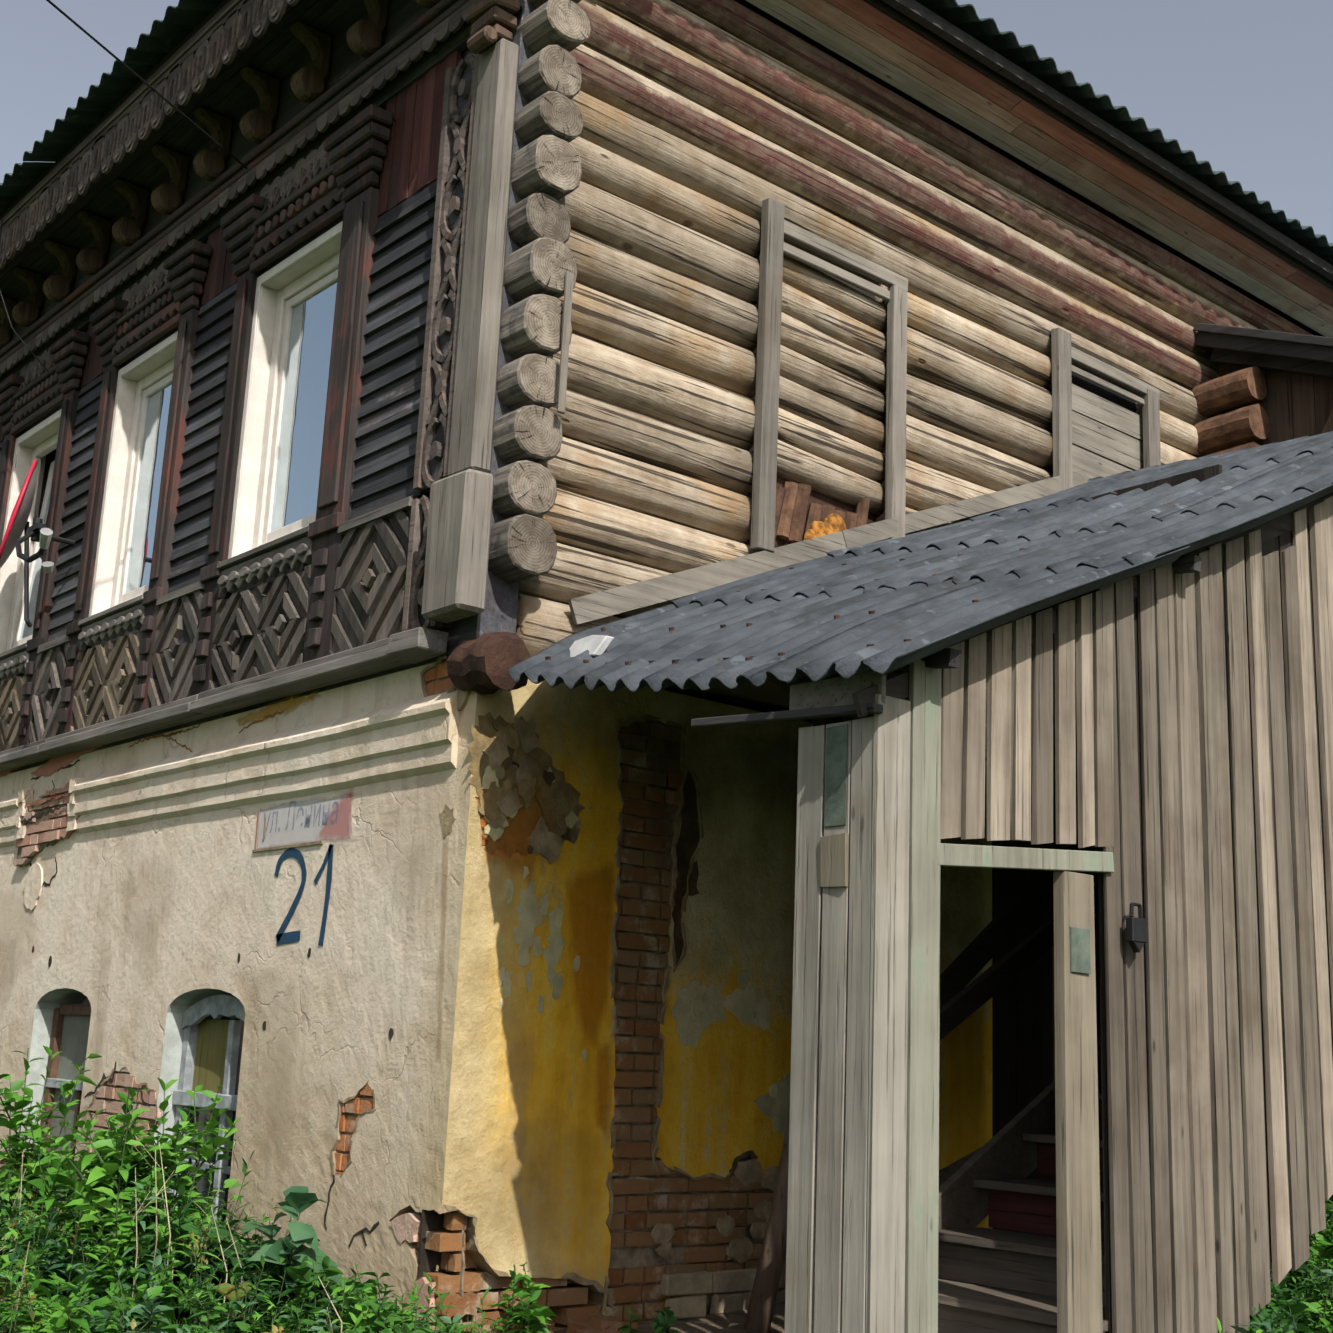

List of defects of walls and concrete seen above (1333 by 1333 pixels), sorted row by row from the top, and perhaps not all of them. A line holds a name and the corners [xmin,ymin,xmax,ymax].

spalling [0,743,110,867]
peeling [420,656,585,1013]
spalling [389,714,778,1333]
spalling [83,1062,162,1153]
spalling [324,1080,376,1230]
peeling [752,1071,791,1137]
spalling [775,1252,786,1303]